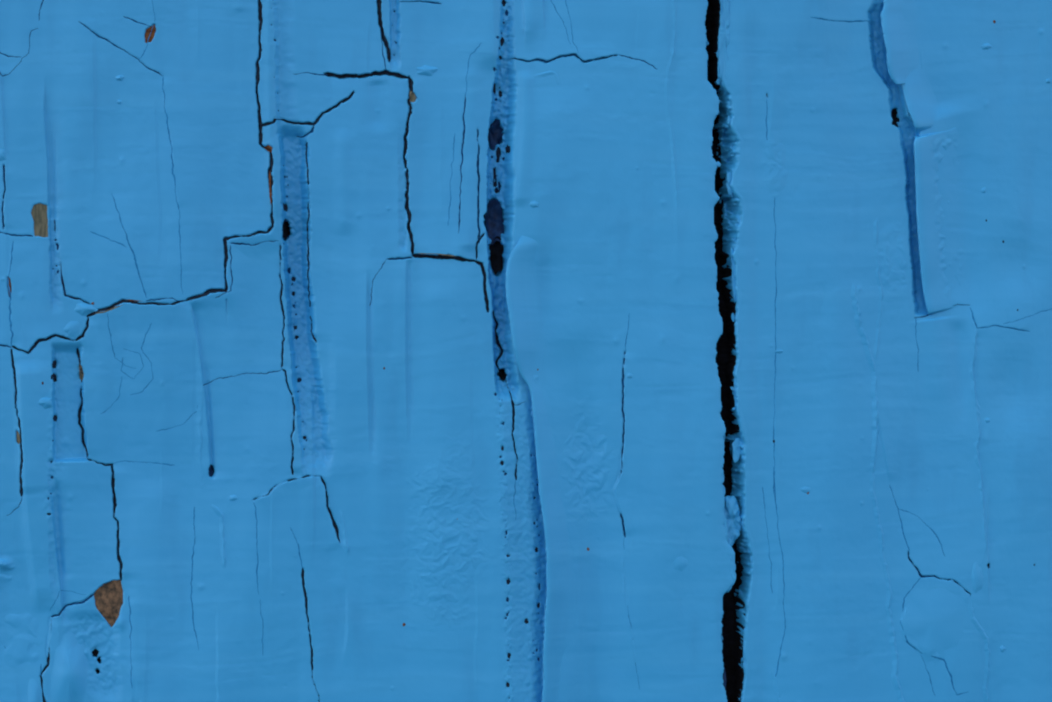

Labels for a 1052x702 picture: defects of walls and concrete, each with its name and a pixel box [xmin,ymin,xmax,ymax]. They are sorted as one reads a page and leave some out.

hole [493,0,508,101]
hole [490,140,510,193]
crack [0,0,524,702]
crack [954,304,1051,332]
crack [890,487,971,695]